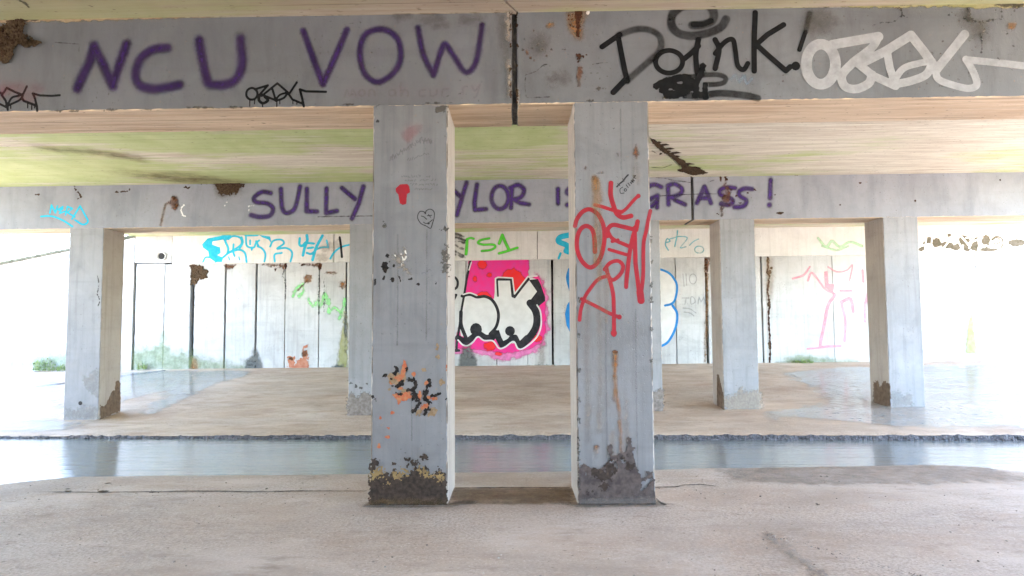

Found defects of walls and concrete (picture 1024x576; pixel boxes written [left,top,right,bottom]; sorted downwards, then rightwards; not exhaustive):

spalling [0,18,42,64]
corrosion [568,11,590,39]
spalling [184,183,245,206]
spalling [189,264,209,286]
corrosion [612,350,622,451]
peeling [873,380,891,407]
peeling [344,343,448,505]
peeling [577,437,656,505]